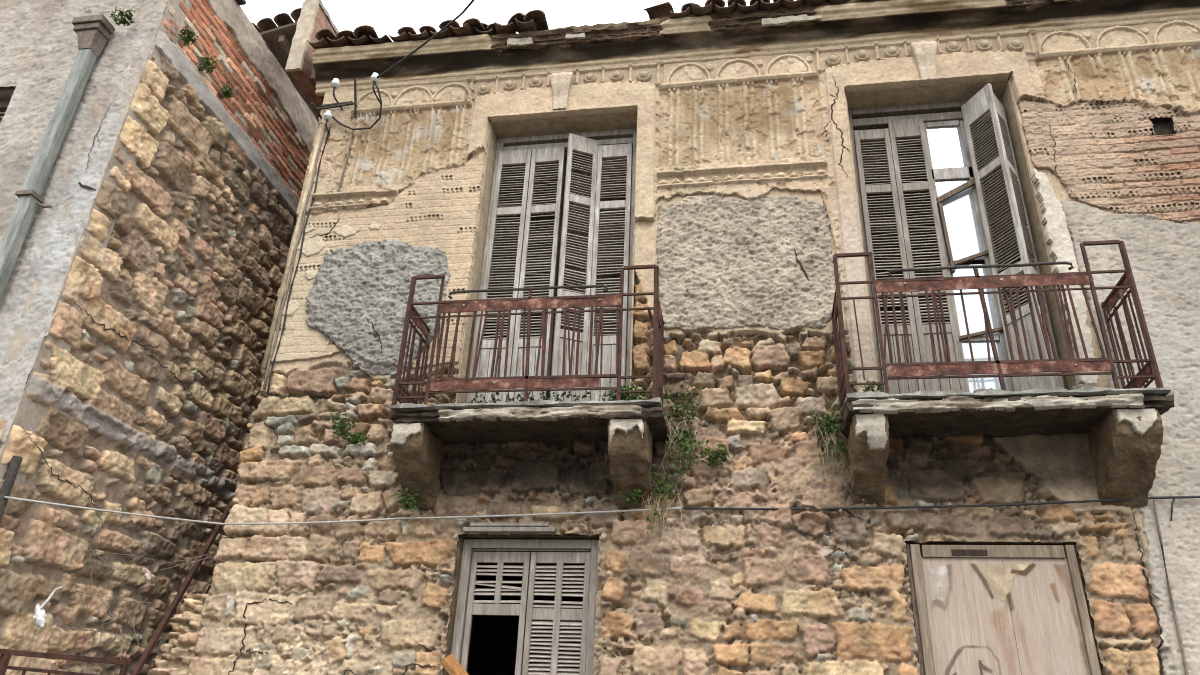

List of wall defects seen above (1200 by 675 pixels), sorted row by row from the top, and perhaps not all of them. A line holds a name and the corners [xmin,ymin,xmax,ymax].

peeling [507,37,533,47]
peeling [761,14,822,27]
crack [824,76,850,177]
flaking render [1017,98,1200,223]
flaking render [270,145,487,369]
crack [65,295,200,402]